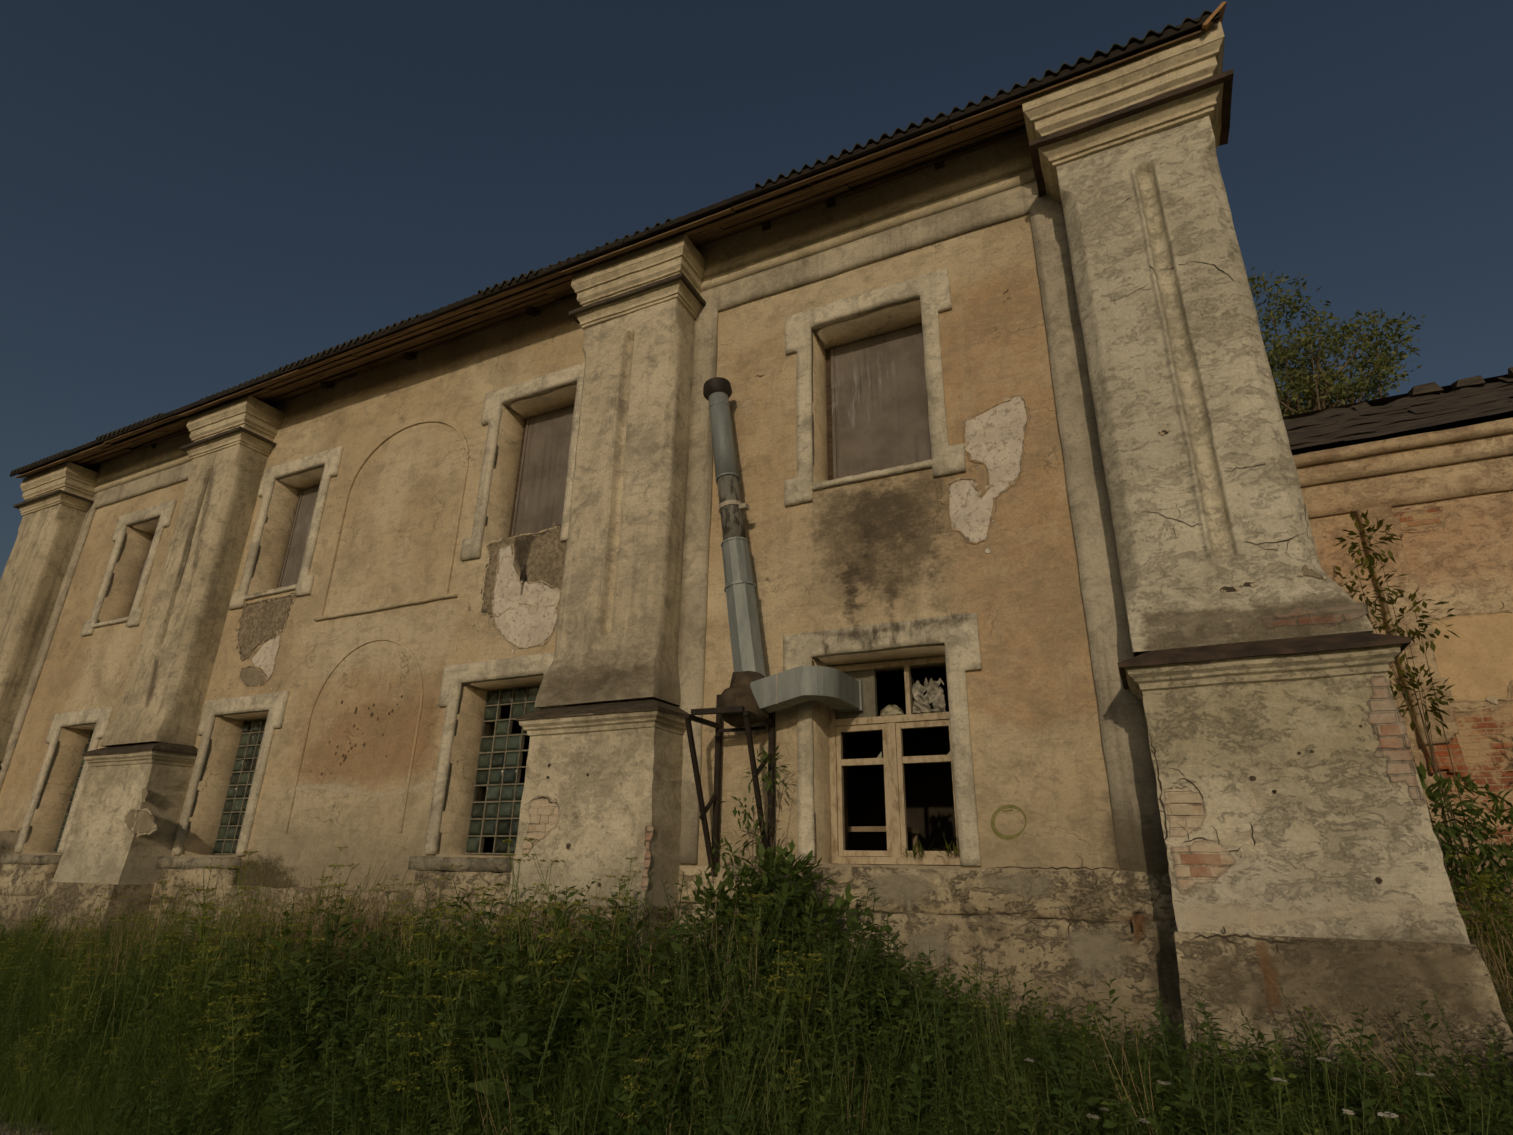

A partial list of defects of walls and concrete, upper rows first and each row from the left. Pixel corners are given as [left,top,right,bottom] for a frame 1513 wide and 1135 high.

flaking render [946,395,1030,553]
flaking render [235,593,296,690]
flaking render [468,522,567,653]
flaking render [1359,609,1513,860]
flaking render [1164,786,1236,895]